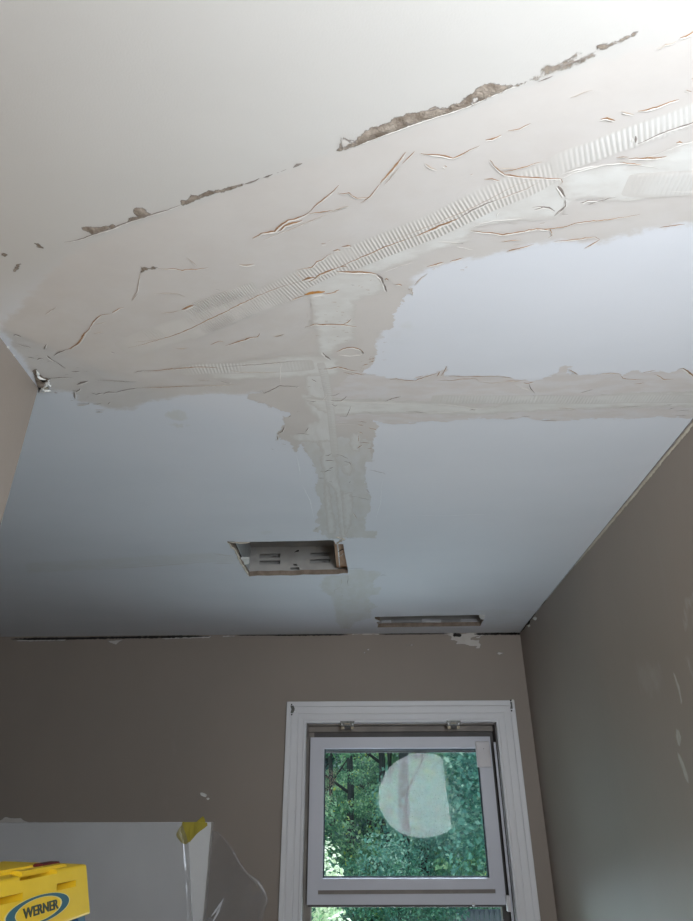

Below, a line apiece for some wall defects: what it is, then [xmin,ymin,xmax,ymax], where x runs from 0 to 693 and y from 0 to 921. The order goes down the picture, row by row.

crack [538,51,596,82]
crack [600,90,693,165]
crack [15,123,693,482]
peeling [446,633,484,648]